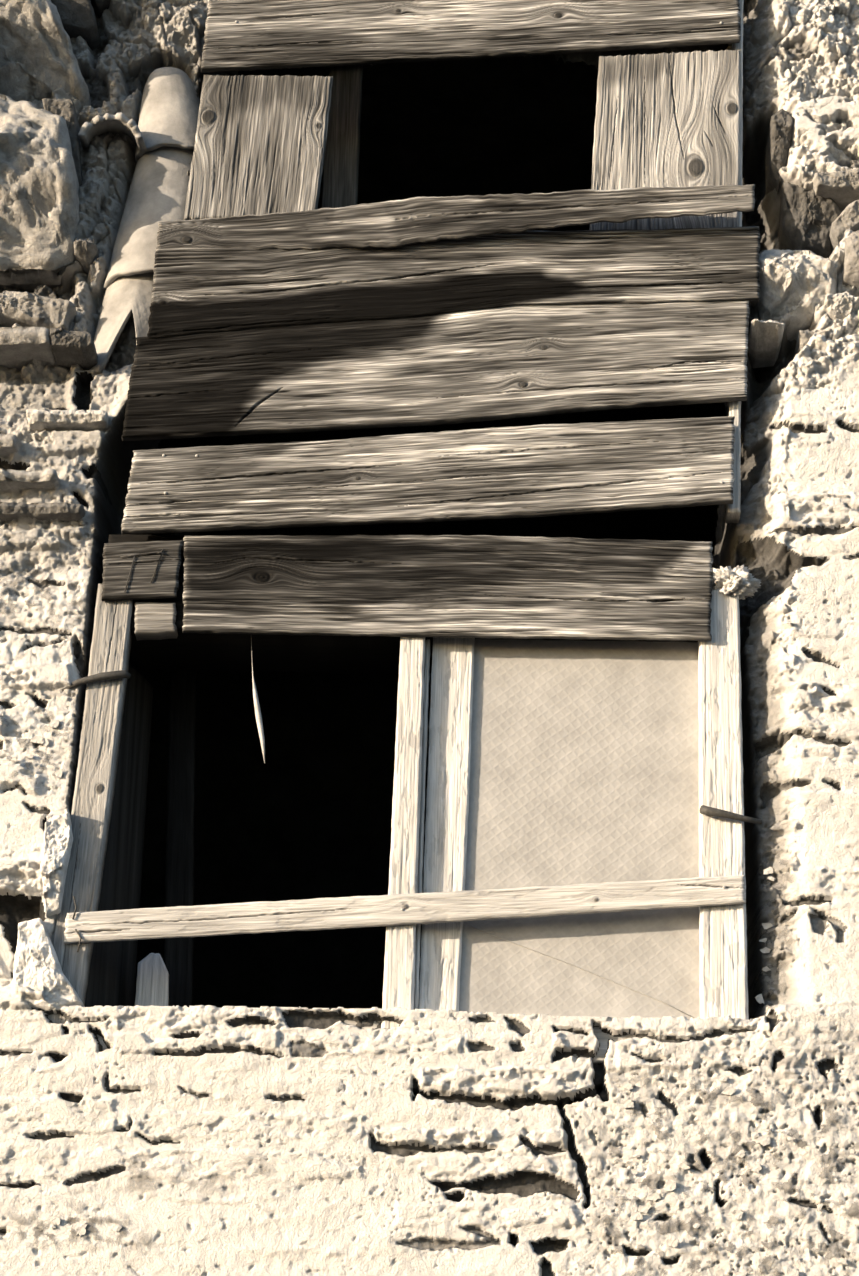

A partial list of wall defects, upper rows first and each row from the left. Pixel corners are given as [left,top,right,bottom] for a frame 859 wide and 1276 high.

crack [558,1022,754,1209]